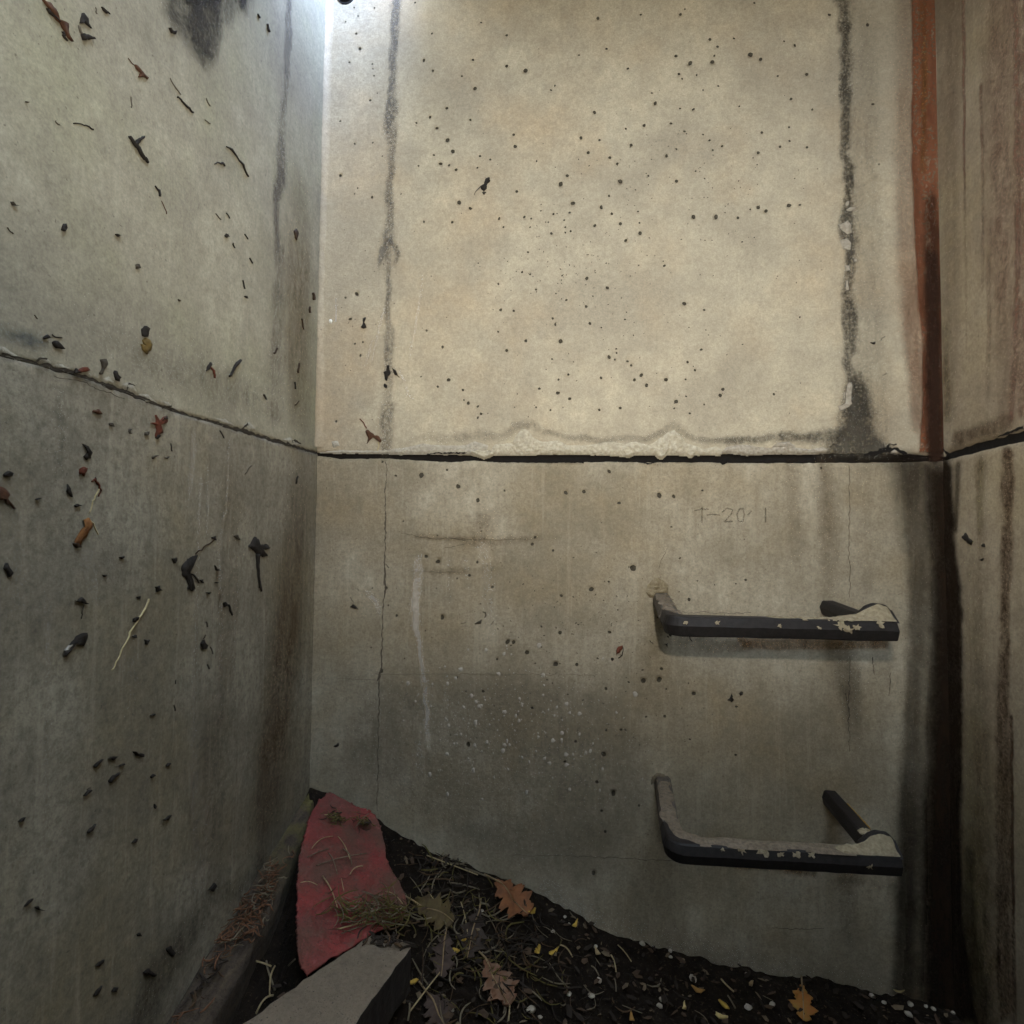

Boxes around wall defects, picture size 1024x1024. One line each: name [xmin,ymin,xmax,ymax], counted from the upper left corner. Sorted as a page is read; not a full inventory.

leakage [169,0,246,55]
leakage [378,0,400,372]
leakage [779,0,890,458]
rust [906,0,944,463]
crack [0,353,1024,811]
leakage [896,459,985,1023]